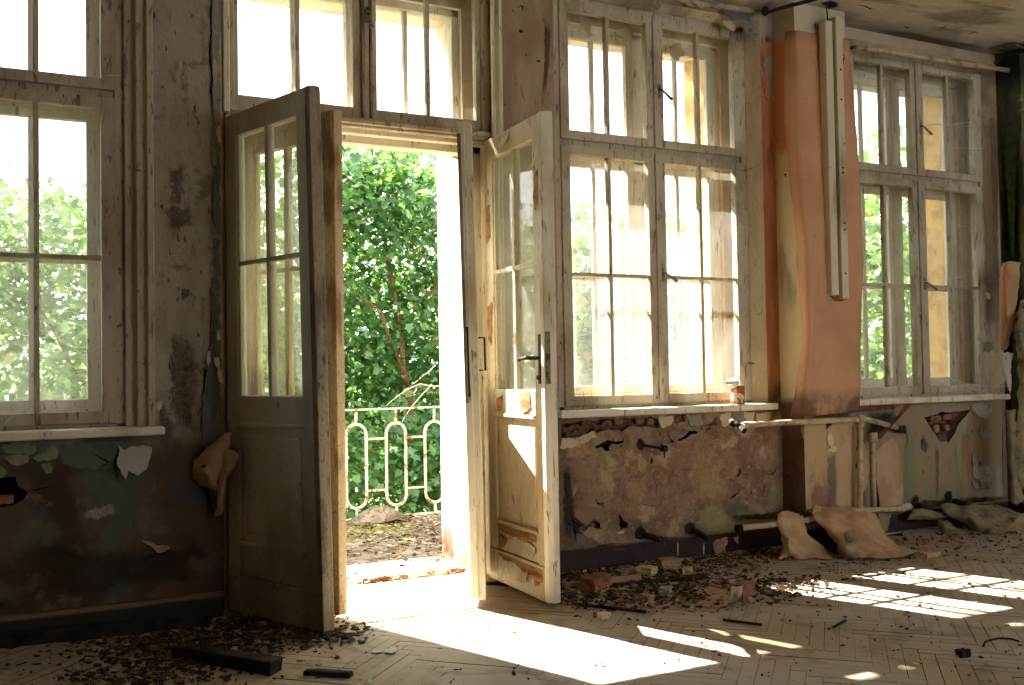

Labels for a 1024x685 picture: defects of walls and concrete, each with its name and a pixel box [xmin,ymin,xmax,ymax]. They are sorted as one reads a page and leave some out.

water stain [165,167,195,233]
peeling [200,121,224,448]
water stain [157,327,202,443]
spalling [560,414,703,449]
spalling [925,410,969,442]
peeling [0,440,59,507]
spalling [572,506,628,542]